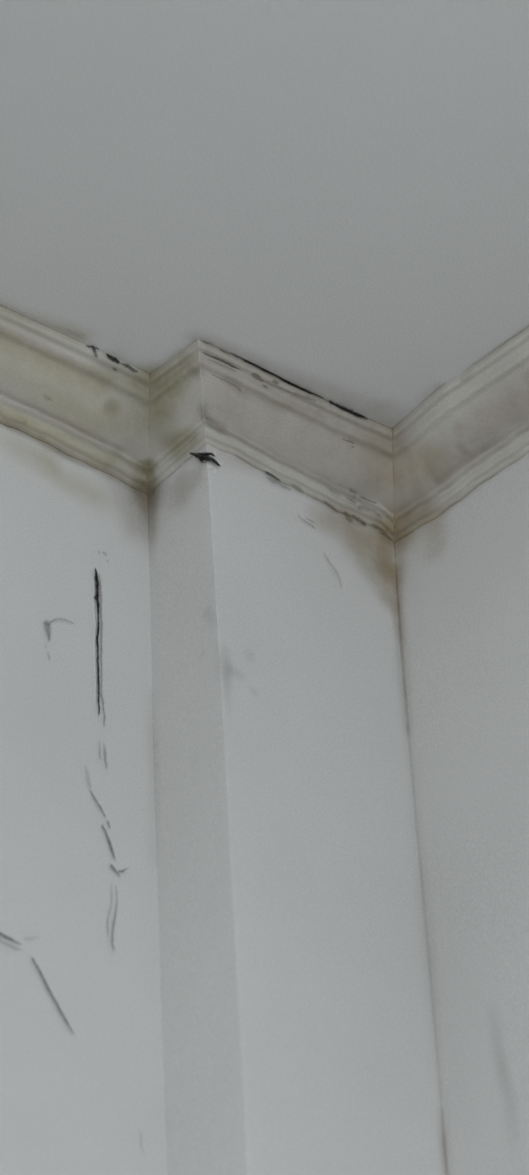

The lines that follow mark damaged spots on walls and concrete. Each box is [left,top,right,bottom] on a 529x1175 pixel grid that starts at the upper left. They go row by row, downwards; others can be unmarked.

crack [205,351,367,419]
crack [92,568,100,715]
crack [92,794,125,872]
crack [0,933,74,1034]